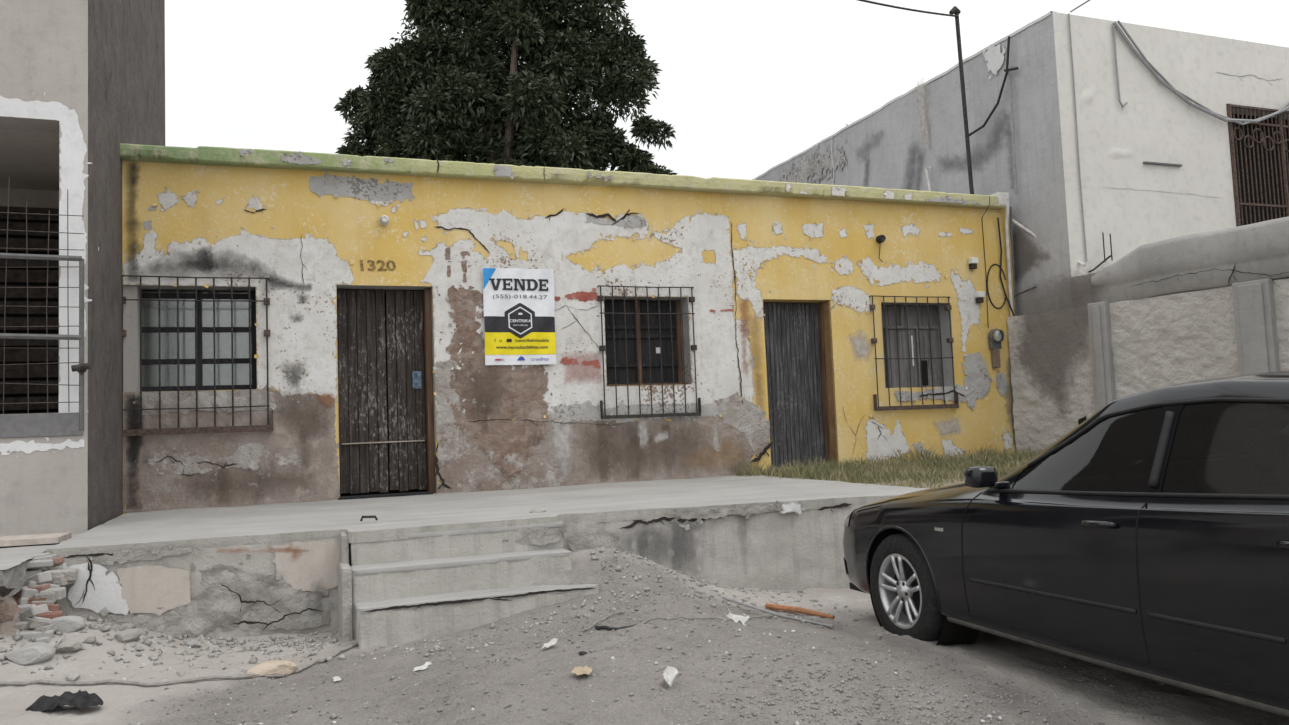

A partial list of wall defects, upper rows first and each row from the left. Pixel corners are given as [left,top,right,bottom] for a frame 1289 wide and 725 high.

spalling [276,151,415,213]
spalling [493,165,515,179]
spalling [884,189,981,205]
peeling [123,185,355,512]
peeling [403,200,1009,493]
efflorescence [550,412,571,474]
water stain [591,420,697,464]
spalling [661,501,812,531]
spalling [99,554,334,638]